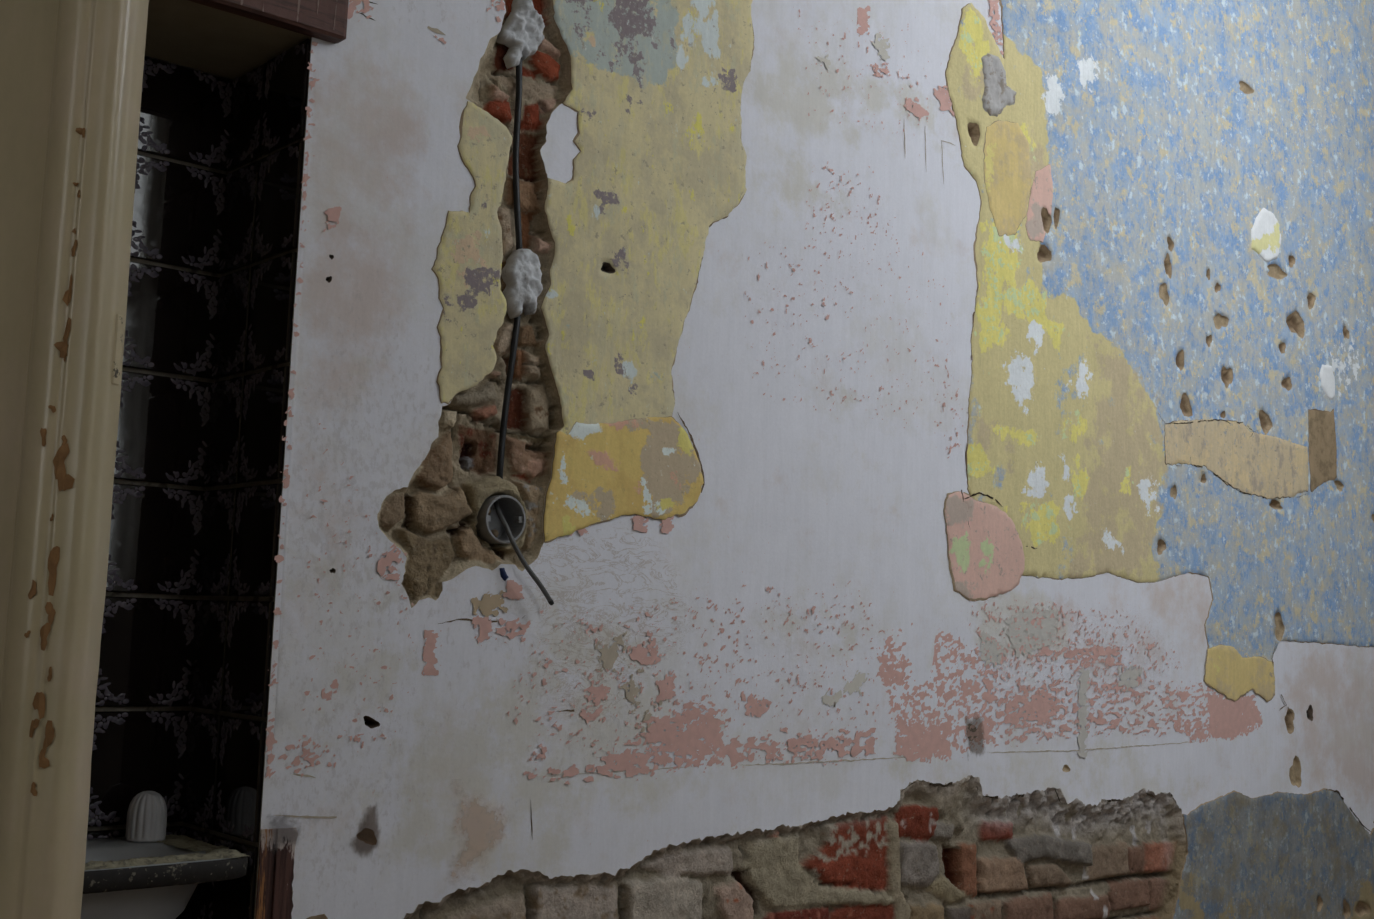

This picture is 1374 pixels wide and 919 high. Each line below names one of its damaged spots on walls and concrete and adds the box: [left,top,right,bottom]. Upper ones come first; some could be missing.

peeling [54,228,78,362]
peeling [264,0,1374,784]
peeling [40,428,75,491]
peeling [24,546,60,651]
peeling [29,667,54,796]
flaking render [404,755,1374,919]